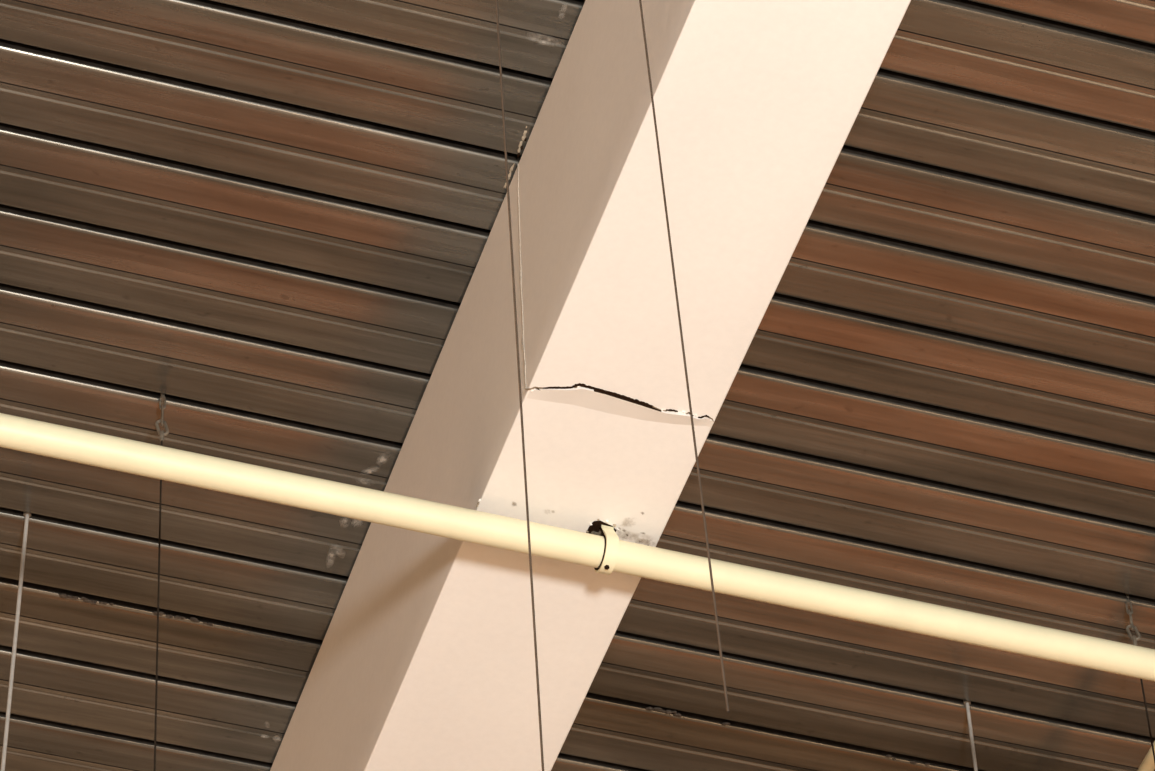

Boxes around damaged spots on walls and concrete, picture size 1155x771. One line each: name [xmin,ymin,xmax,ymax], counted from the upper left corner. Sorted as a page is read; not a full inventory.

crack [518,173,714,422]